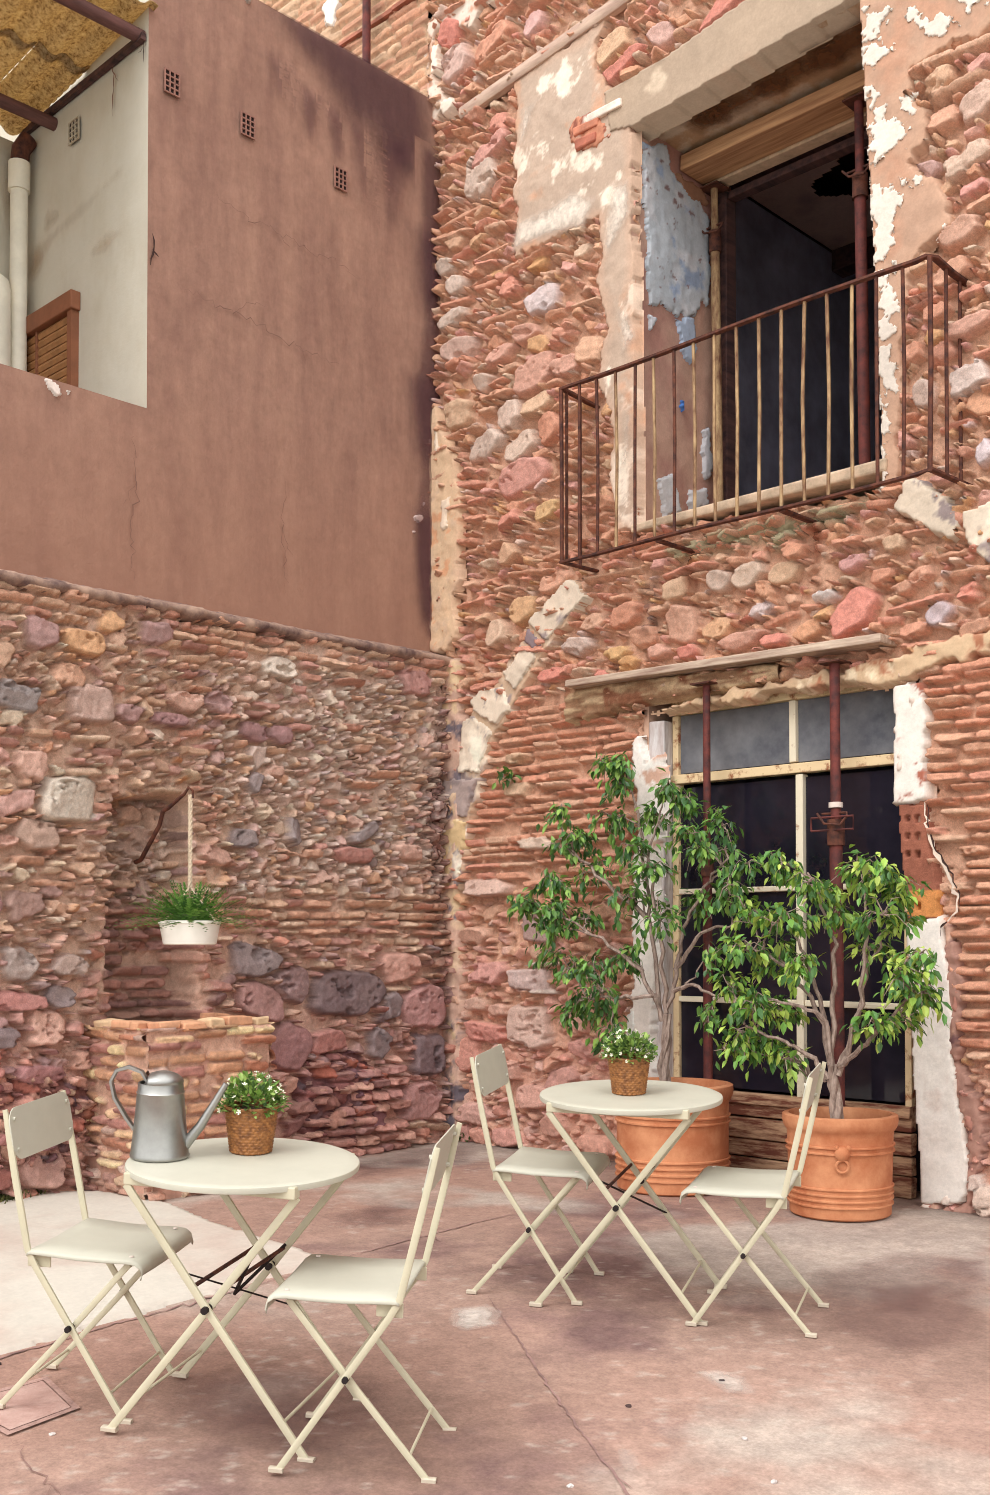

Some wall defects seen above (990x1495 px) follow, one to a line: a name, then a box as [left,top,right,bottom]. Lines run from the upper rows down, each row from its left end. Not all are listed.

damp [293,18,419,168]
flaking render [512,20,713,531]
flaking render [859,0,990,499]
peeling [893,679,937,806]
crack [924,802,961,936]